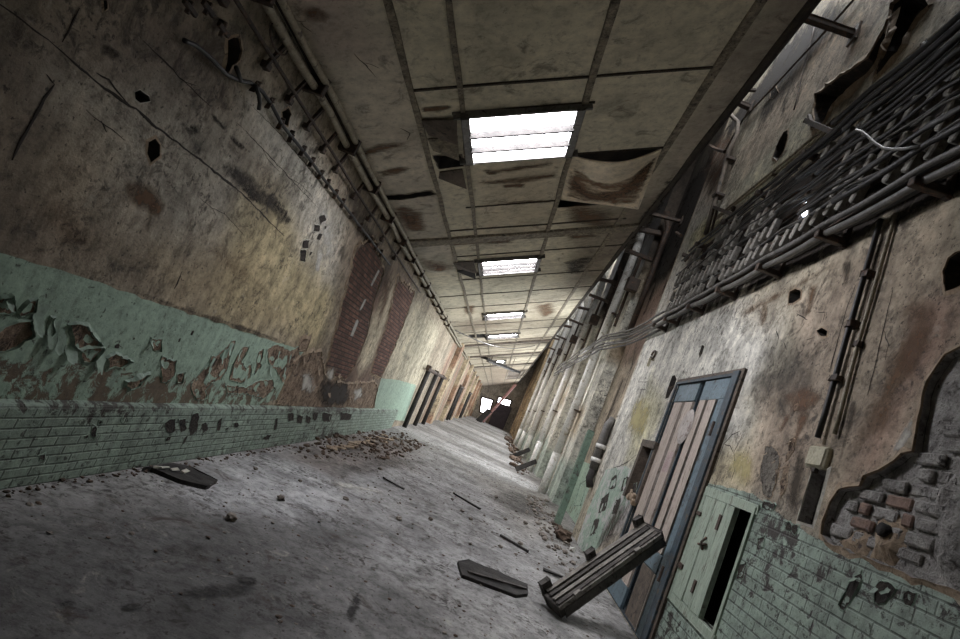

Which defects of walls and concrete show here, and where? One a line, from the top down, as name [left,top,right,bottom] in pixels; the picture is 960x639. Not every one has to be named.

crack [0,4,284,236]
crack [236,104,325,206]
water stain [485,164,554,188]
spalling [809,0,935,136]
spalling [0,235,415,446]
spalling [818,343,960,612]